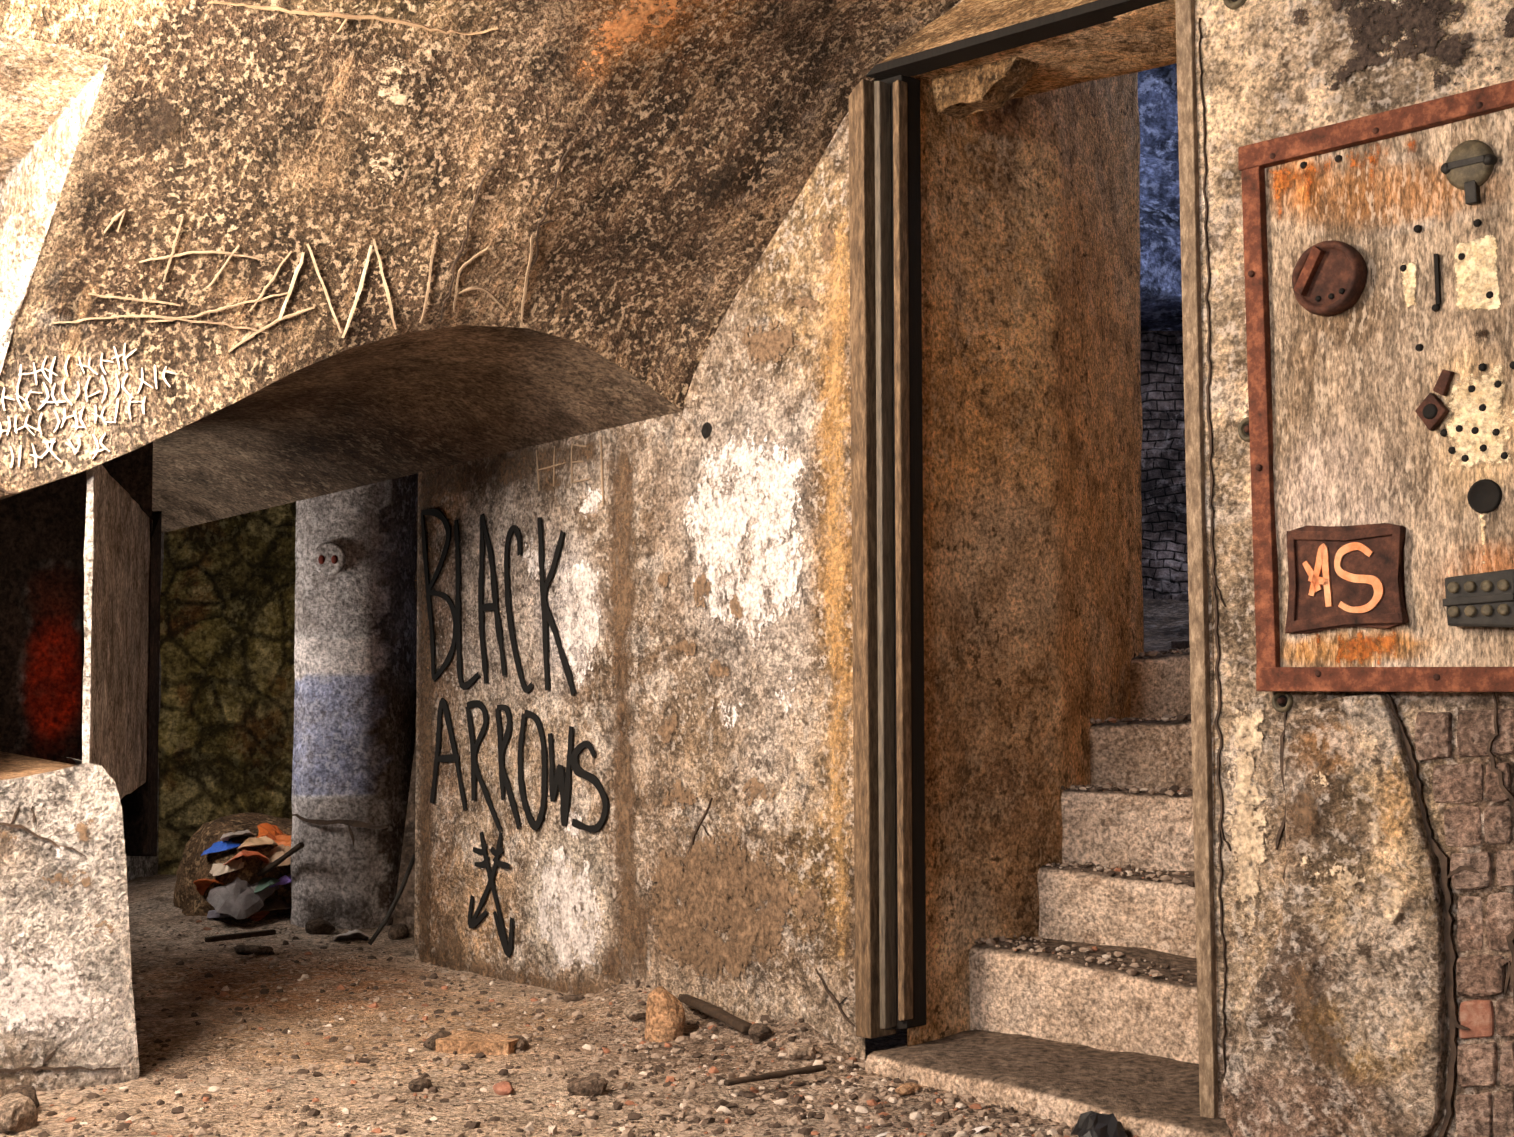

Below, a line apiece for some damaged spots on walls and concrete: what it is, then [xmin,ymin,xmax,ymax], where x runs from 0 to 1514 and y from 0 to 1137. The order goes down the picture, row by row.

corrosion [1271,144,1387,218]
corrosion [1335,631,1396,667]
peeling [1221,694,1514,1137]
crack [1385,692,1479,1137]